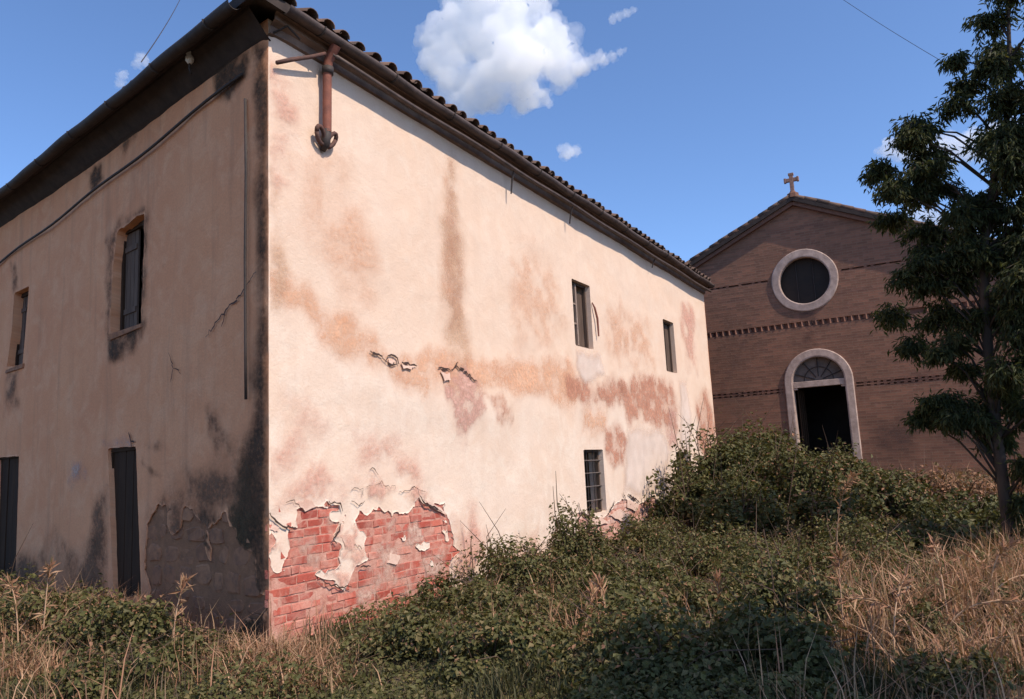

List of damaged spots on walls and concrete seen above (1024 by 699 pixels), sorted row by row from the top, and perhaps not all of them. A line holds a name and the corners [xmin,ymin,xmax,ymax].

damp [215,46,294,301]
damp [108,321,145,361]
crack [208,272,256,335]
damp [443,192,485,432]
damp [190,308,294,592]
damp [567,376,678,444]
damp [697,394,716,453]
damp [4,497,104,602]
flaking render [145,467,459,644]
flaking render [577,493,657,540]
damp [240,615,268,642]